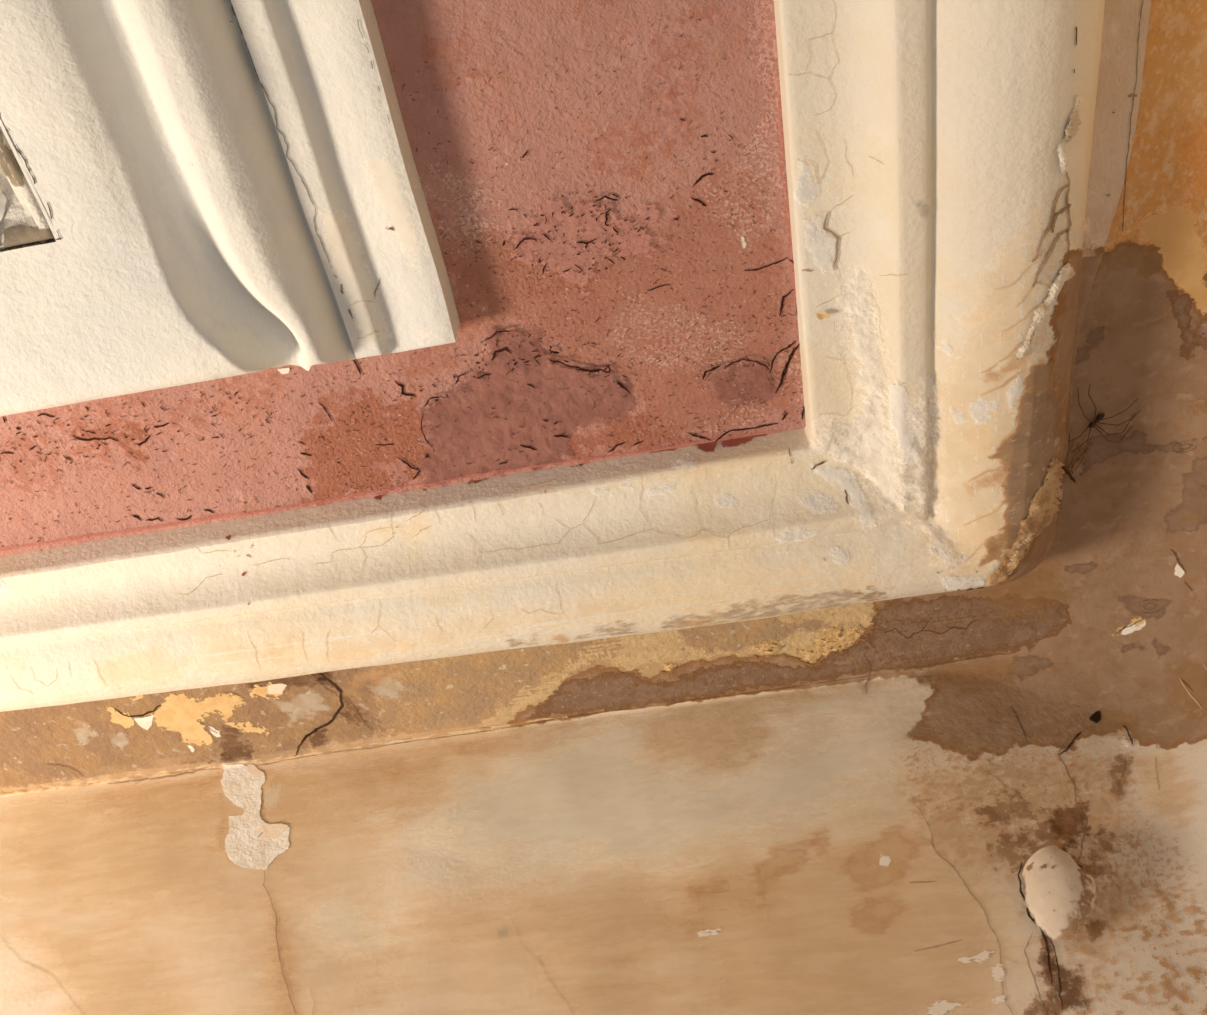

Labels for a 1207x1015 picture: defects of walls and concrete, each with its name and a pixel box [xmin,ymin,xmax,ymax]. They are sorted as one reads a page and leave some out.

crack [229,0,353,319]
crack [395,381,415,397]
crack [687,258,805,443]
crack [131,484,214,522]
damp [0,241,1207,796]
peeling [487,602,874,721]
peeling [107,682,287,752]
flaking render [221,764,290,870]
damp [975,789,1119,879]
crack [914,803,1063,1015]
damp [1024,935,1089,1015]
damp [1086,921,1105,942]